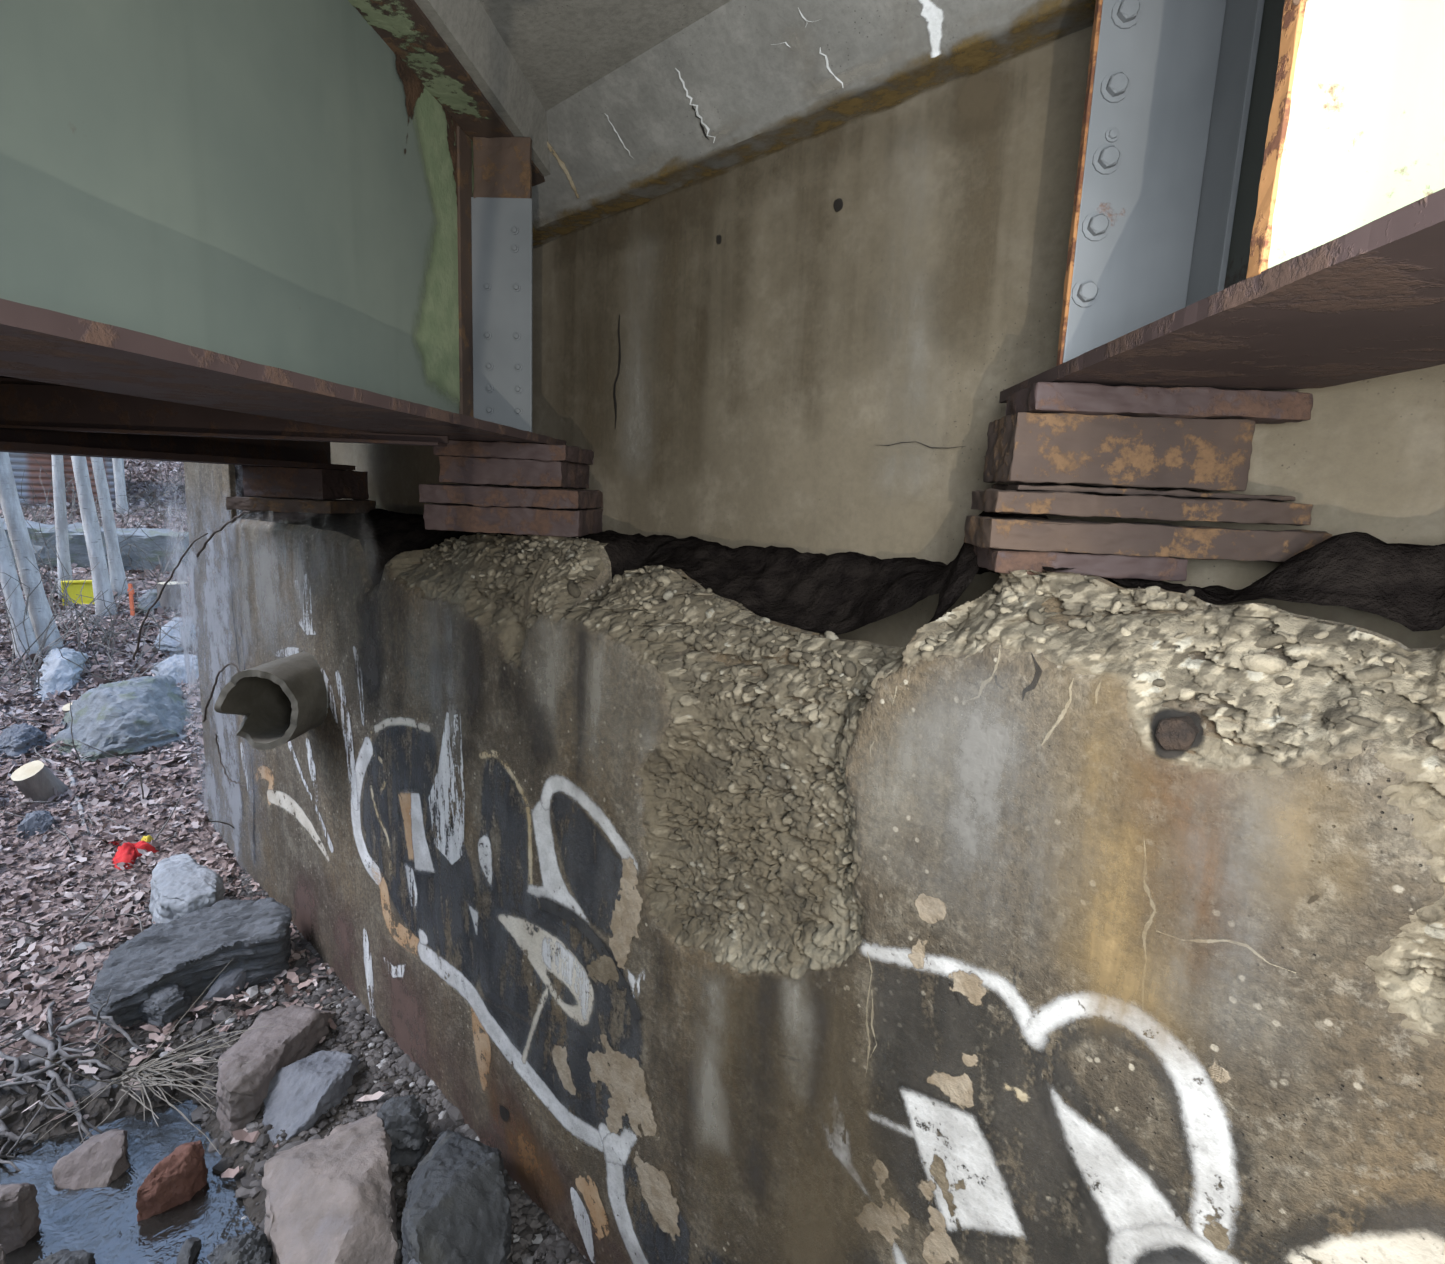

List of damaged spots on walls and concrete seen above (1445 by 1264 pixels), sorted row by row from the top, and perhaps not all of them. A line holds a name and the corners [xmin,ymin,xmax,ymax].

crack [605,114,633,158]
crack [675,68,715,143]
crack [771,8,843,87]
leakage [919,0,943,58]
leakage [950,67,1013,313]
leakage [167,505,373,864]
spalling [385,532,1445,1046]
peeling [552,1034,680,1241]